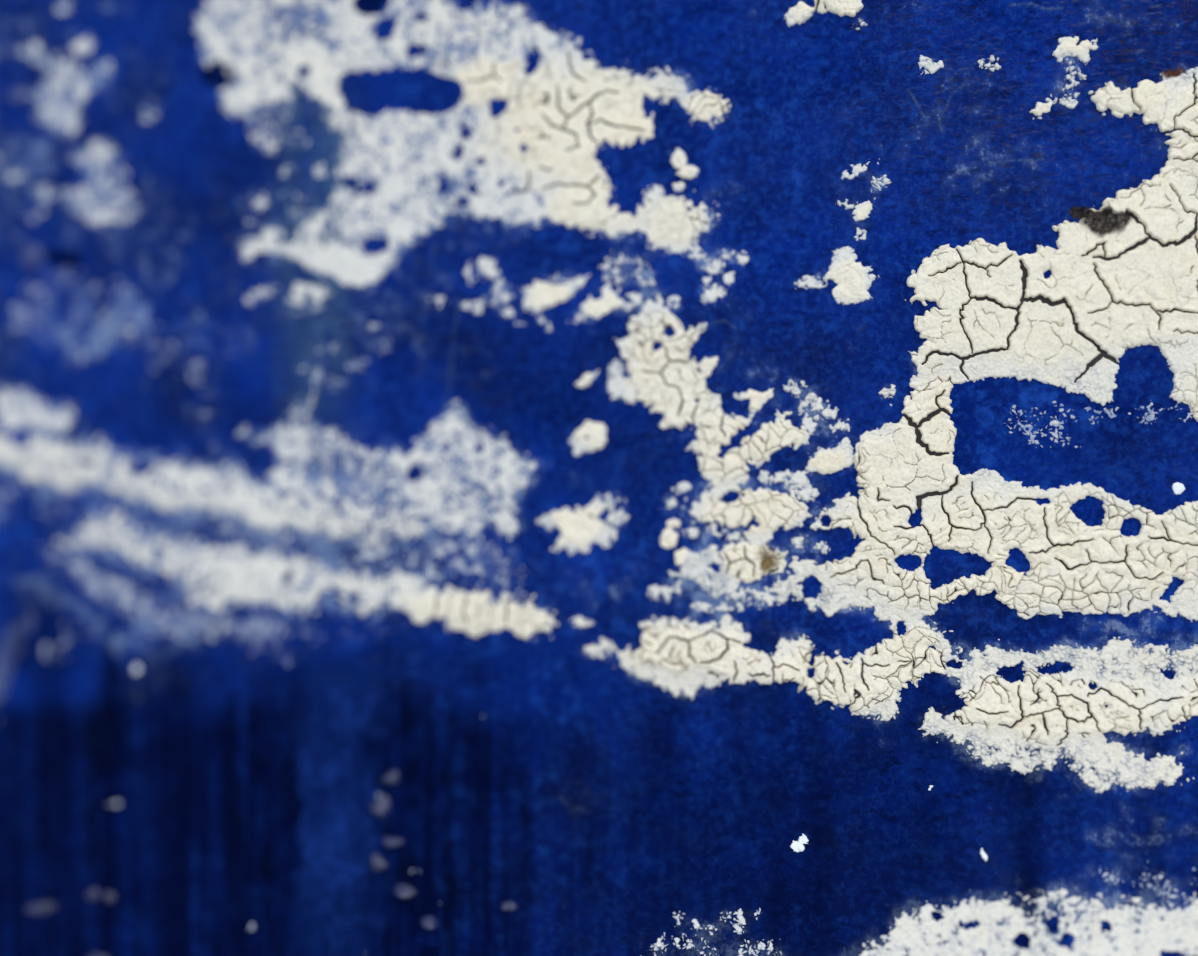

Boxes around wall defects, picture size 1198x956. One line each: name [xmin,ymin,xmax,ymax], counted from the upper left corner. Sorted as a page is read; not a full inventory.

crack [514,51,645,205]
crack [831,74,1198,584]
crack [643,346,726,436]
peeling [193,0,1198,793]
peeling [0,323,594,666]
crack [724,546,755,577]
crack [656,628,799,684]
crack [836,658,889,692]
crack [976,684,1182,746]
peeling [790,834,809,852]
peeling [650,908,782,956]
peeling [859,861,1198,956]